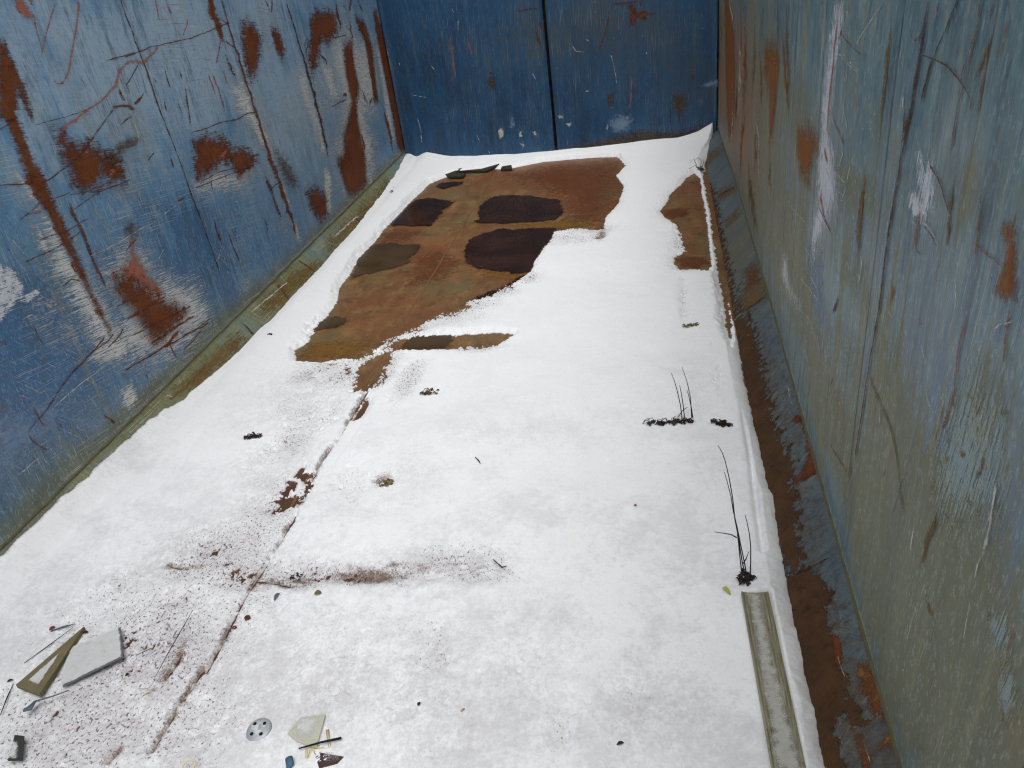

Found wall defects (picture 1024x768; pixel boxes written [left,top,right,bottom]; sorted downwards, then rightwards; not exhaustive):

rust [614,0,655,27]
rust [190,0,405,313]
rust [0,40,209,371]
rust [517,220,594,229]
rust [663,208,690,219]
rust [678,257,707,268]
rust [975,200,1018,362]
rust [299,340,369,360]